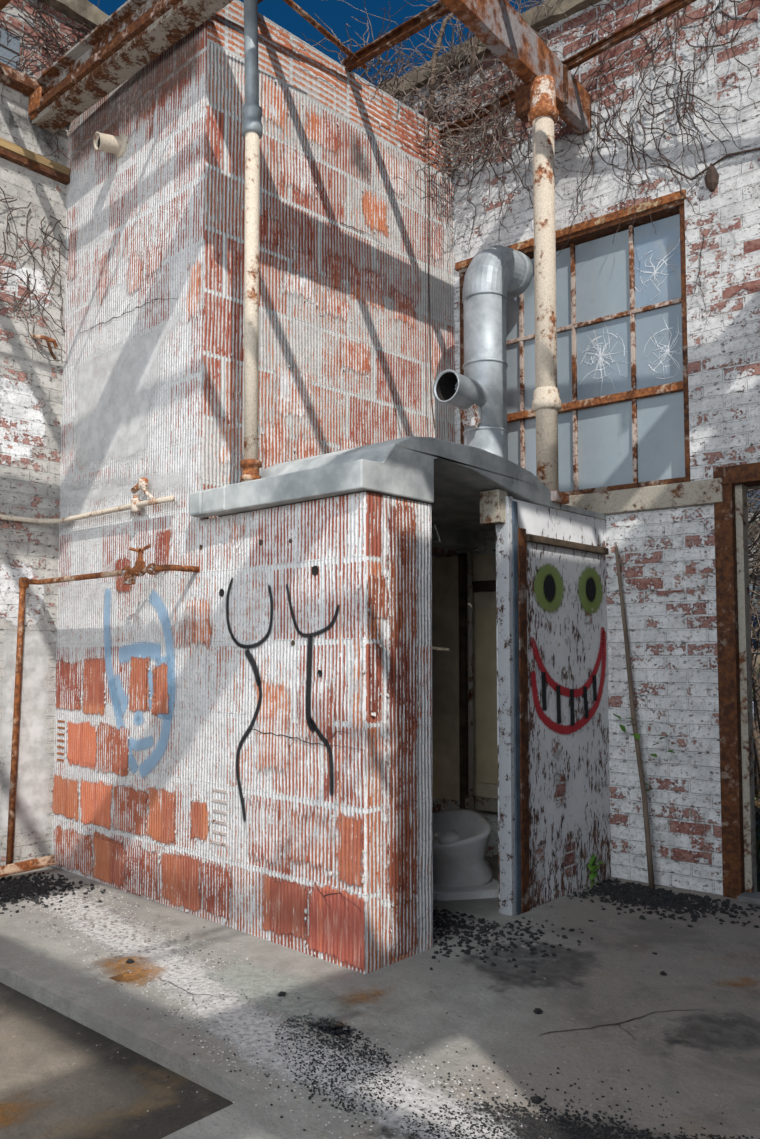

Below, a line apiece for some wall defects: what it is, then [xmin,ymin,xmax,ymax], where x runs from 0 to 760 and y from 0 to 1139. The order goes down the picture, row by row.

flaking render [626,0,760,98]
peeling [259,214,415,328]
flaking render [696,212,760,318]
peeling [229,353,240,402]
peeling [340,338,371,377]
peeling [428,327,448,381]
peeling [219,416,238,467]
peeling [261,364,323,468]
flaking render [551,739,567,808]
flaking render [563,840,578,878]
flaking render [655,818,712,863]
crack [541,1009,704,1040]